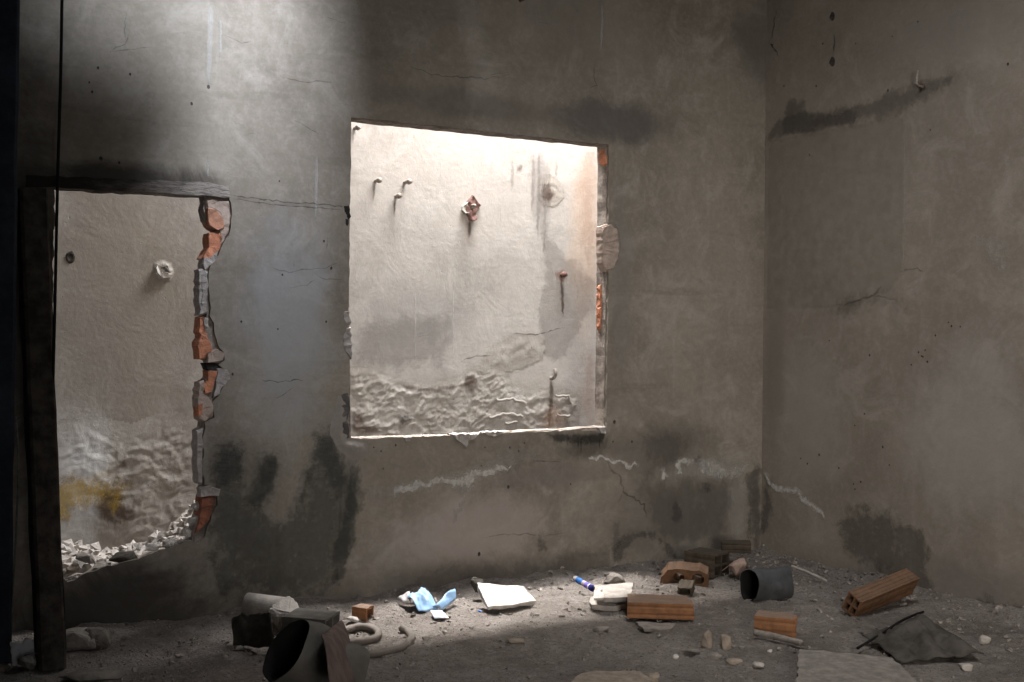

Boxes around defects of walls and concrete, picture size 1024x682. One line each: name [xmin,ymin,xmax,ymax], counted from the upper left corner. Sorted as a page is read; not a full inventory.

peeling [203,198,231,244]
hole [154,259,175,281]
peeling [193,268,209,329]
water stain [59,472,125,520]
spalling [57,349,234,550]
efflorescence [394,465,510,495]
water stain [589,444,636,470]
efflorescence [662,458,743,479]
water stain [765,474,824,517]